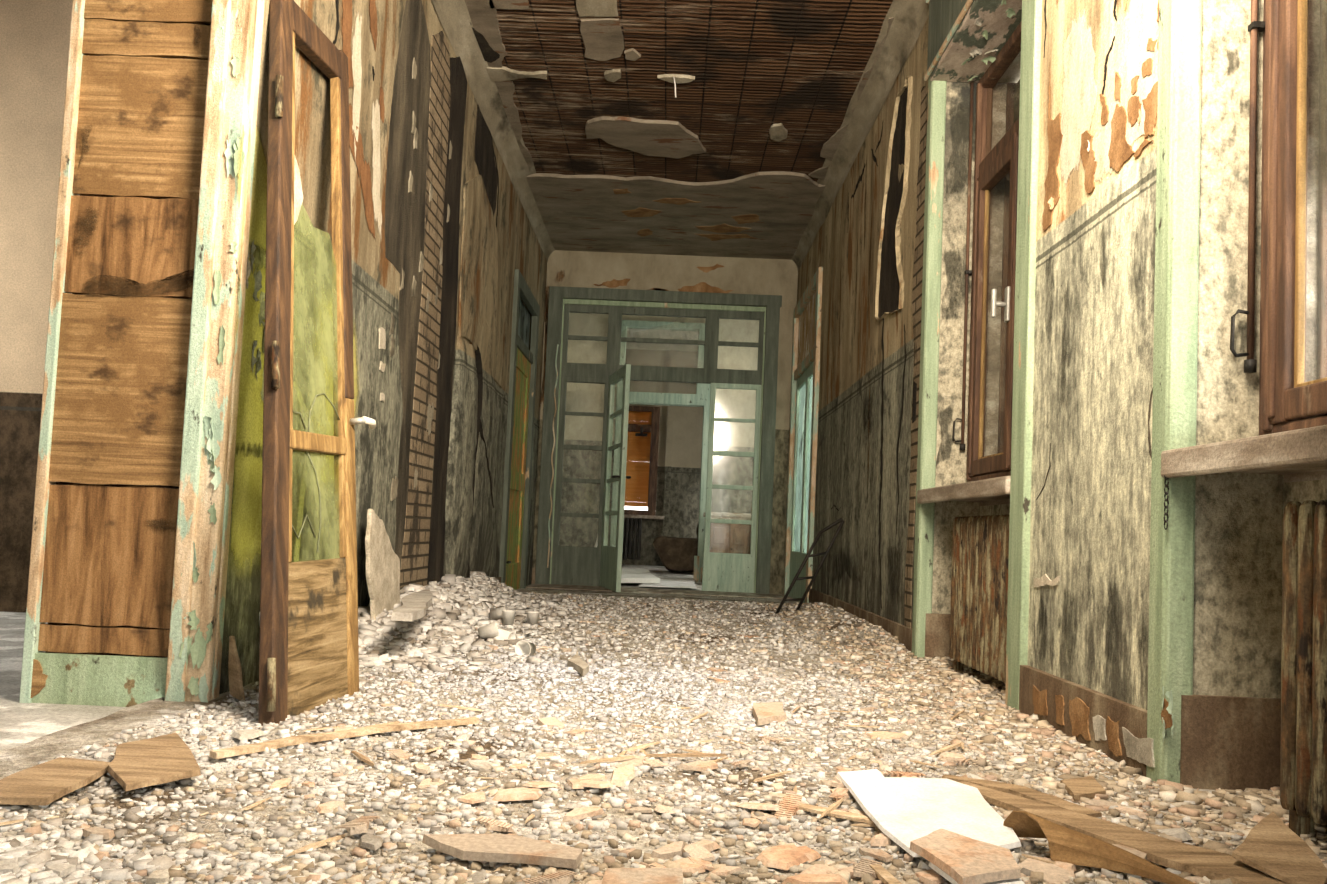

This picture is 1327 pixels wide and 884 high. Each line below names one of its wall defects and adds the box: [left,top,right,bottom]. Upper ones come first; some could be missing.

peeling [1042,0,1159,232]
water stain [1134,215,1156,296]
spalling [875,75,928,628]
water stain [1046,256,1070,402]
water stain [1038,588,1077,661]
water stain [1107,585,1119,662]